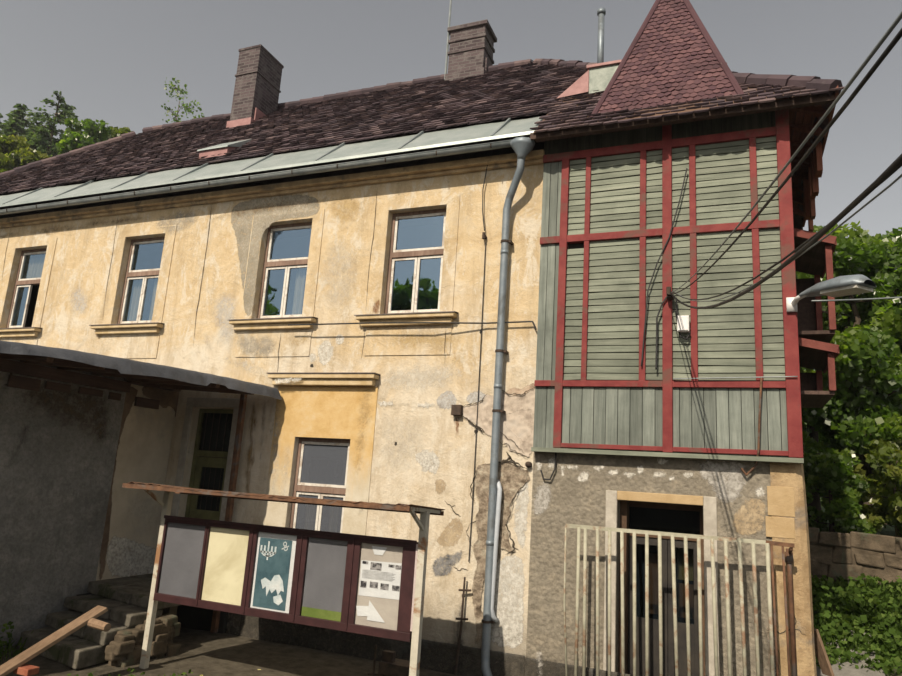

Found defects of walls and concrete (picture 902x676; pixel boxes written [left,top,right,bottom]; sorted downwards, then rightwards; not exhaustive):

crack [193,207,212,344]
crack [475,426,527,469]
flaking render [415,383,693,648]